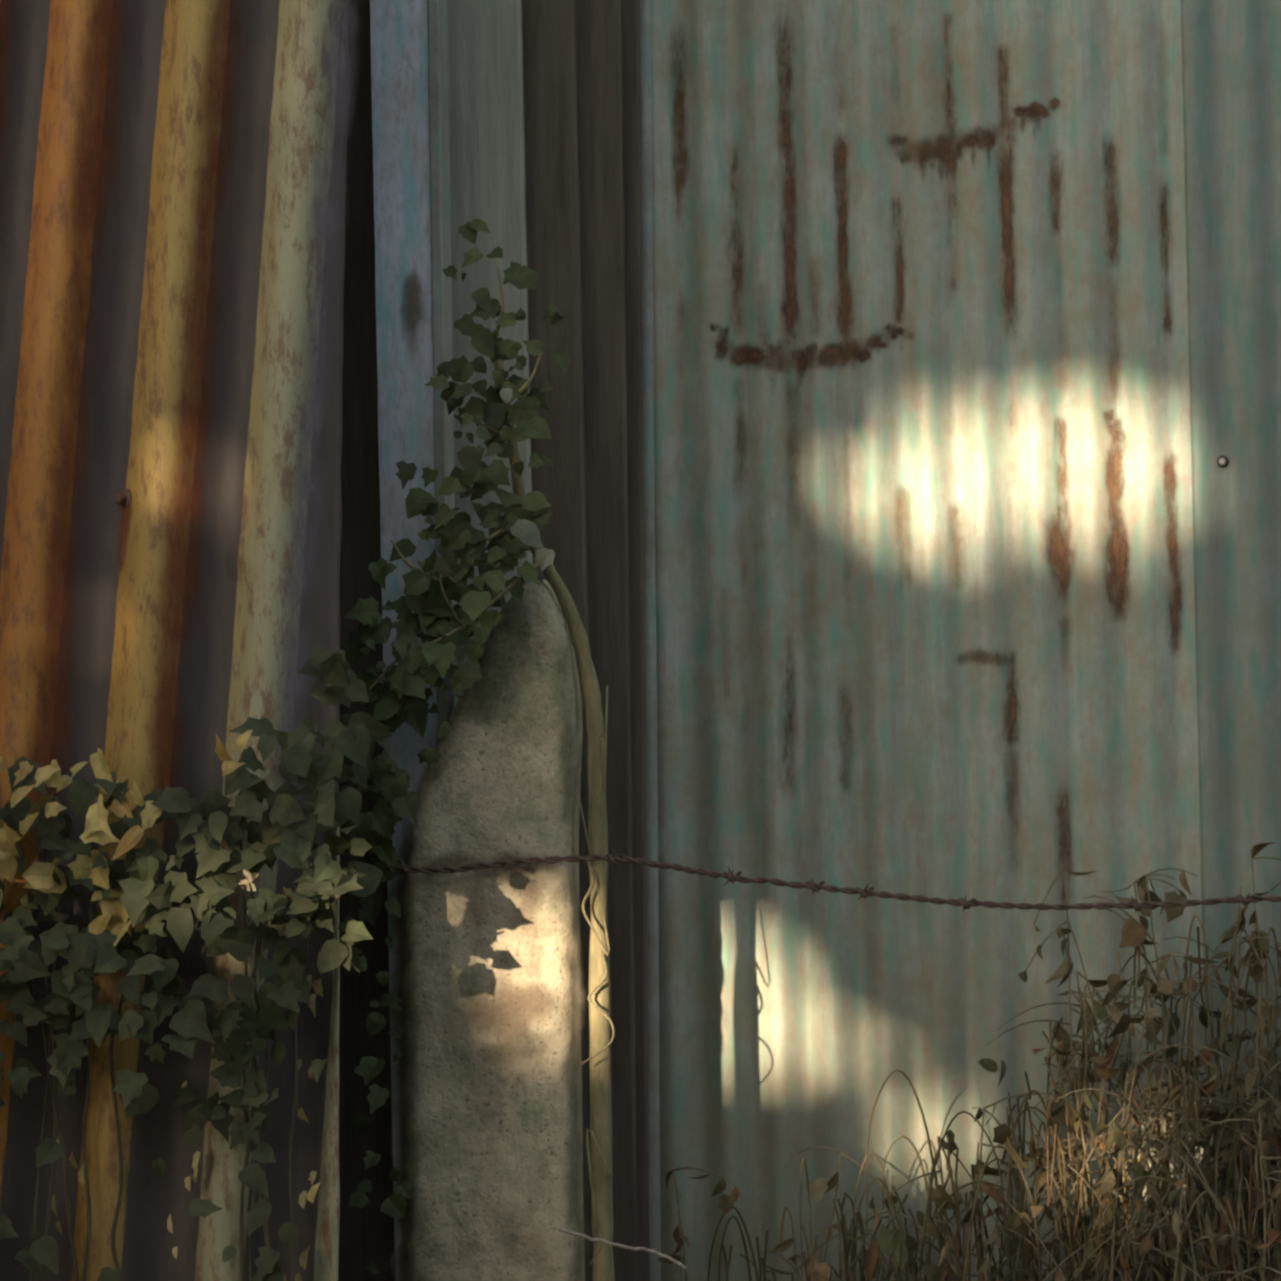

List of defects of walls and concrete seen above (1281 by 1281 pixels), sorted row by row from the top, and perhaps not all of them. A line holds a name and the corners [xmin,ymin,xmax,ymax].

corrosion [673,42,687,203]
corrosion [710,28,904,374]
corrosion [891,49,1060,324]
corrosion [1104,142,1119,262]
corrosion [1160,188,1168,272]
corrosion [1163,294,1171,332]
corrosion [1047,515,1073,596]
corrosion [1055,421,1067,496]
corrosion [1105,410,1128,614]
corrosion [1164,457,1182,651]
corrosion [958,652,1018,743]